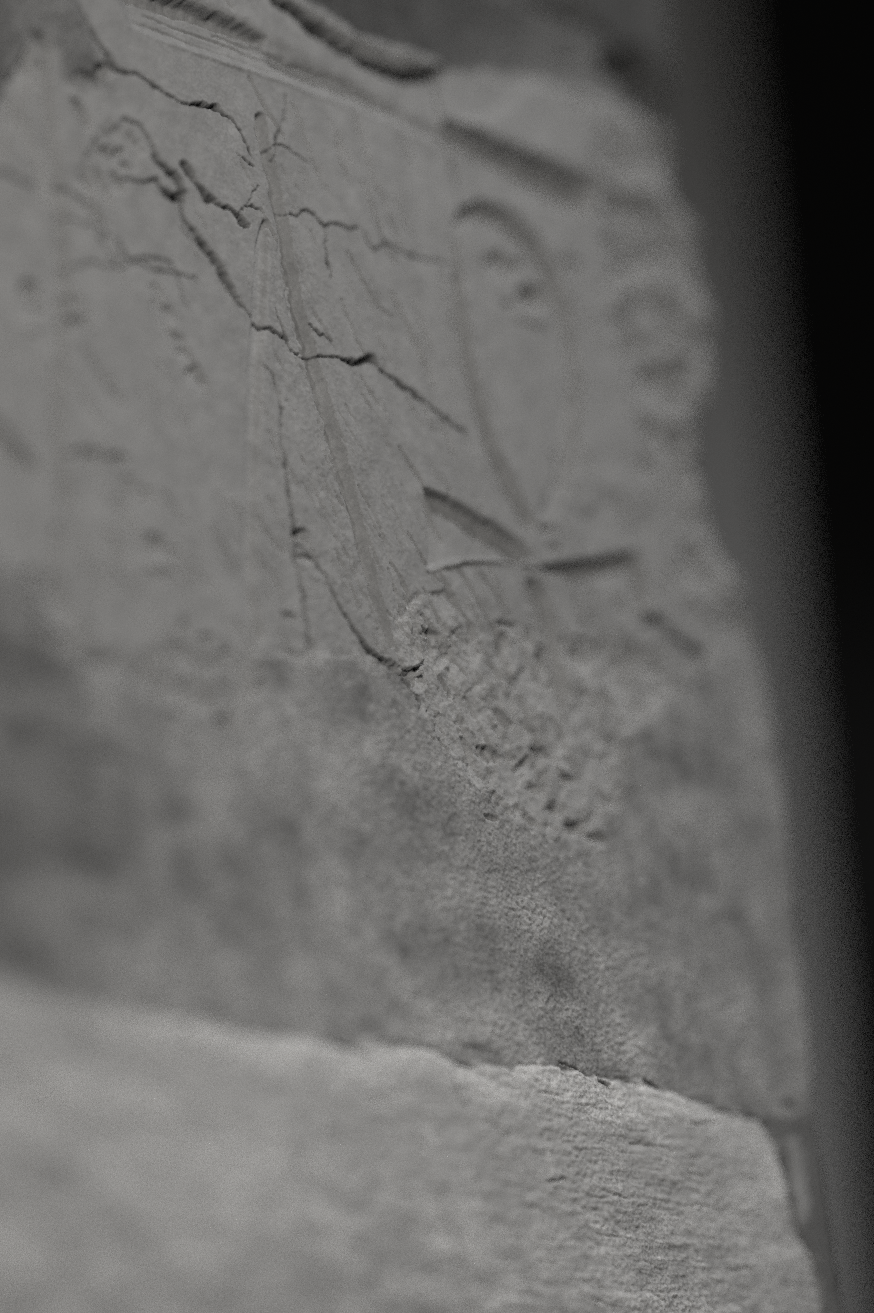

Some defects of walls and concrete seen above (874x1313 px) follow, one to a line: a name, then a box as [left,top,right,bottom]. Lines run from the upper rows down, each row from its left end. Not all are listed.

crack [53,4,468,705]
spalling [384,589,672,846]